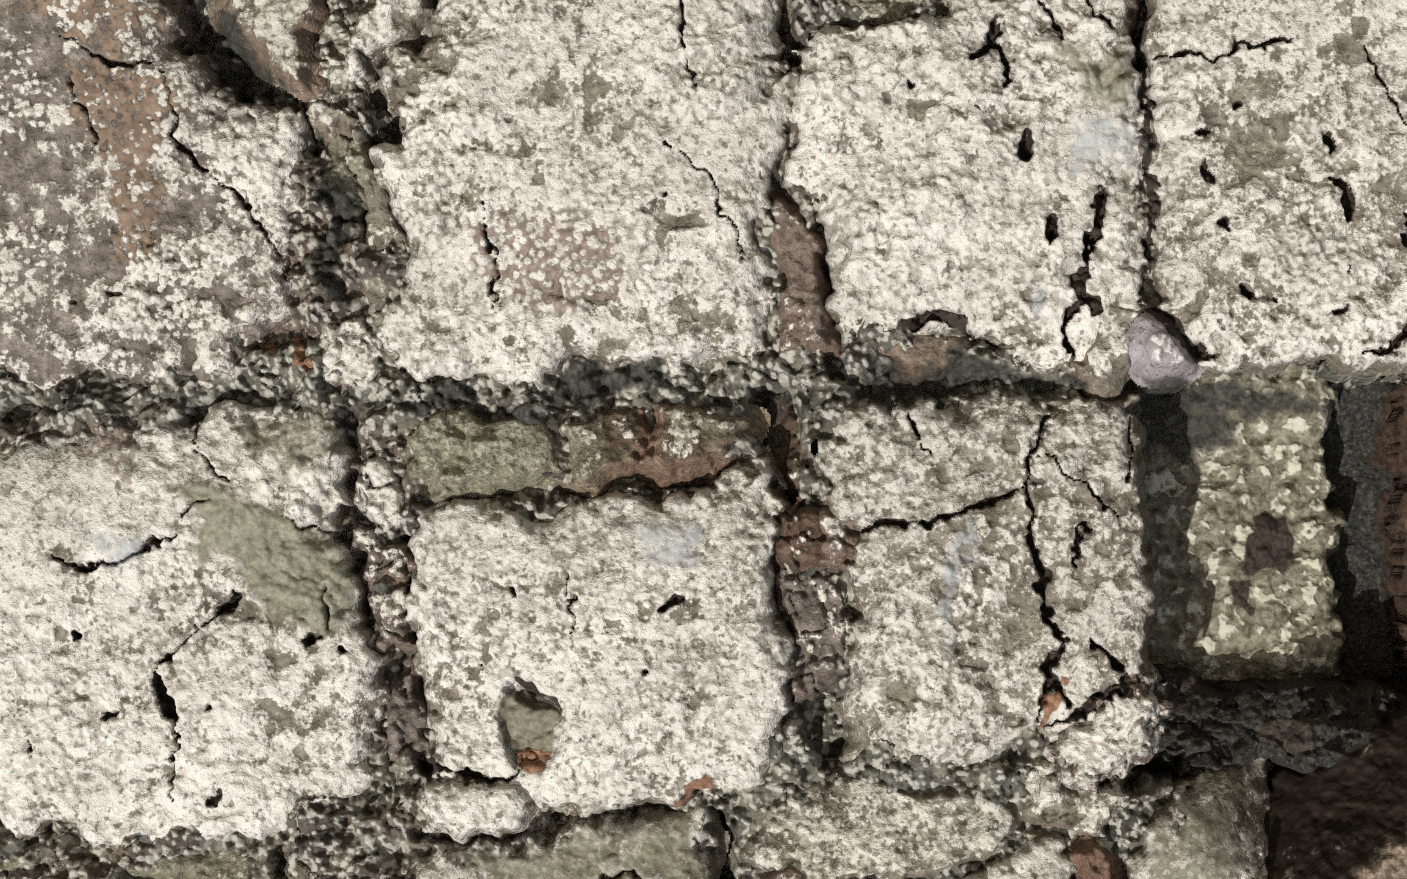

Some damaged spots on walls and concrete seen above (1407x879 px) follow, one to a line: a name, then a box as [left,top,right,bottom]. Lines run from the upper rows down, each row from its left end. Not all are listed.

crack [69,55,145,143]
crack [1367,57,1399,112]
crack [169,115,294,280]
peeling [407,403,771,505]
leakage [1139,378,1327,459]
crack [203,590,242,626]
crack [859,414,1140,725]
leakage [1229,514,1294,616]
leakage [1362,384,1407,692]
crack [151,652,181,782]
spalling [498,677,561,774]